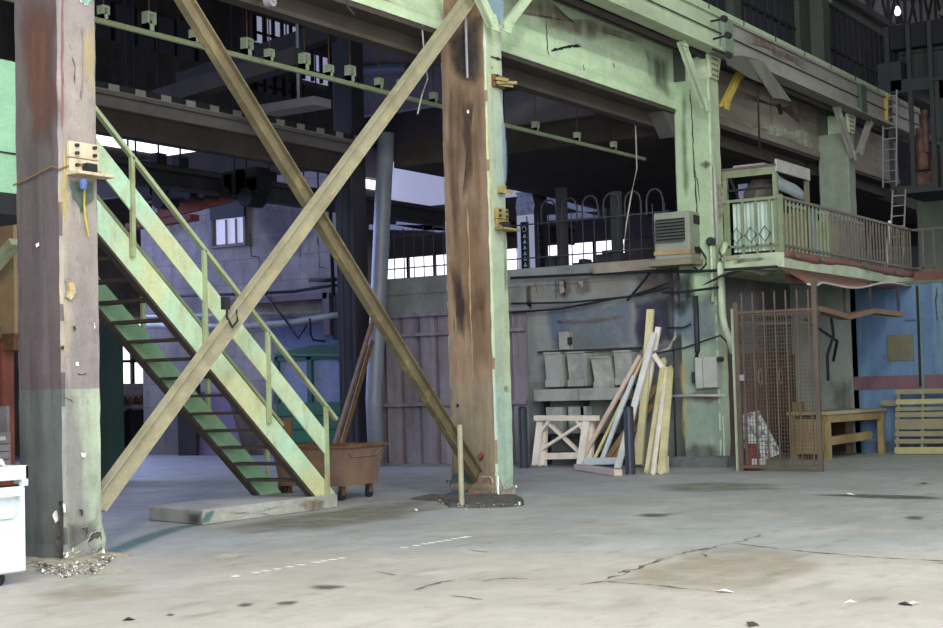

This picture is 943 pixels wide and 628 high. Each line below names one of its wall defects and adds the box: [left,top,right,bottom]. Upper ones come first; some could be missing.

spalling [53,501,105,559]
crack [580,561,687,589]